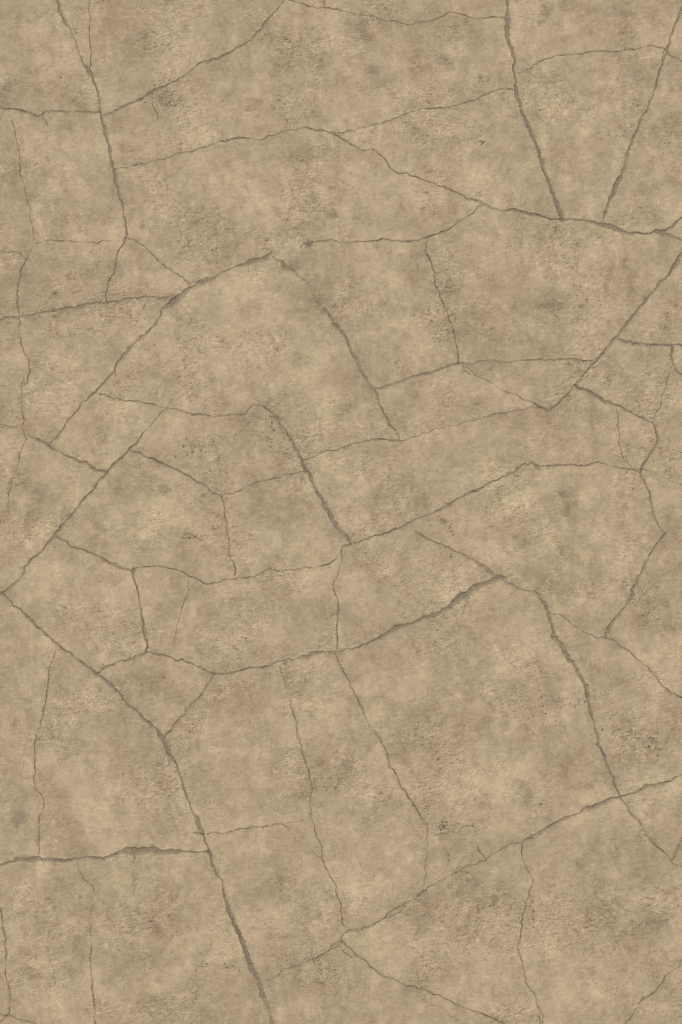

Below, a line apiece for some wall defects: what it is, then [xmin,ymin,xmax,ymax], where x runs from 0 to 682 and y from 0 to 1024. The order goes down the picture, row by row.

crack [97,125,128,244]
crack [237,257,287,269]
crack [493,0,682,472]
crack [29,446,161,562]
crack [292,441,350,543]
crack [292,564,512,673]
crack [542,601,654,804]
crack [2,593,260,988]